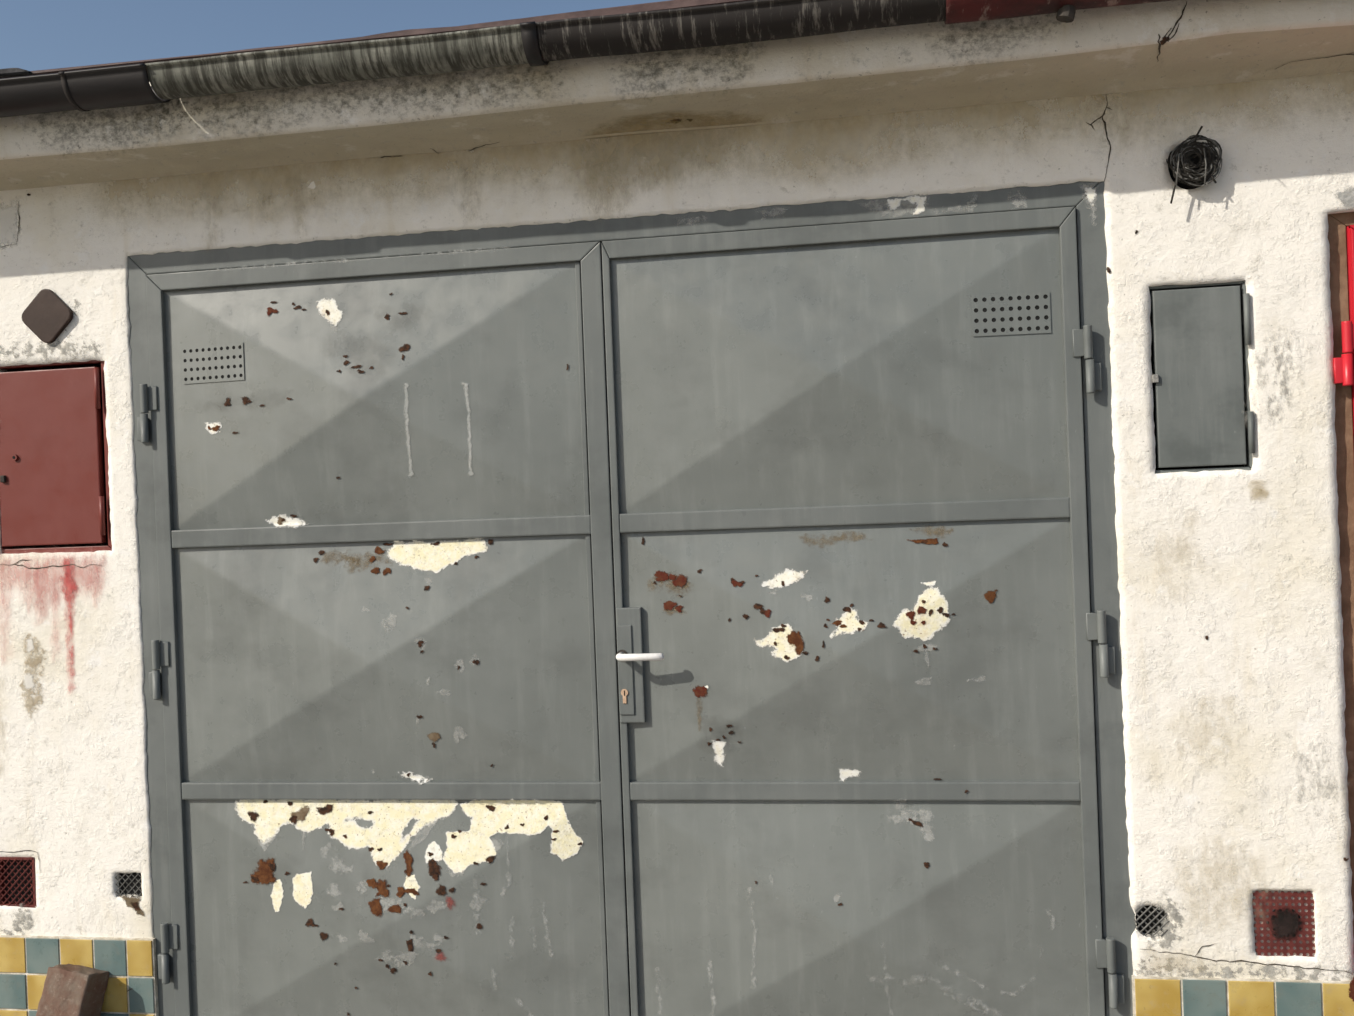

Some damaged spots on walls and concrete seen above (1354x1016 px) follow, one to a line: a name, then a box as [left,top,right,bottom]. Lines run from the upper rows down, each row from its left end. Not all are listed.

crack [1157,1,1187,61]
water stain [115,113,892,195]
crack [1086,96,1112,182]
spalling [1336,187,1354,208]
peeling [369,538,493,591]
rust [653,569,702,612]
rust [728,603,771,621]
peeling [751,581,955,662]
spalling [20,634,46,714]
peeling [234,771,583,917]
peeling [270,871,328,941]
rust [378,930,413,974]